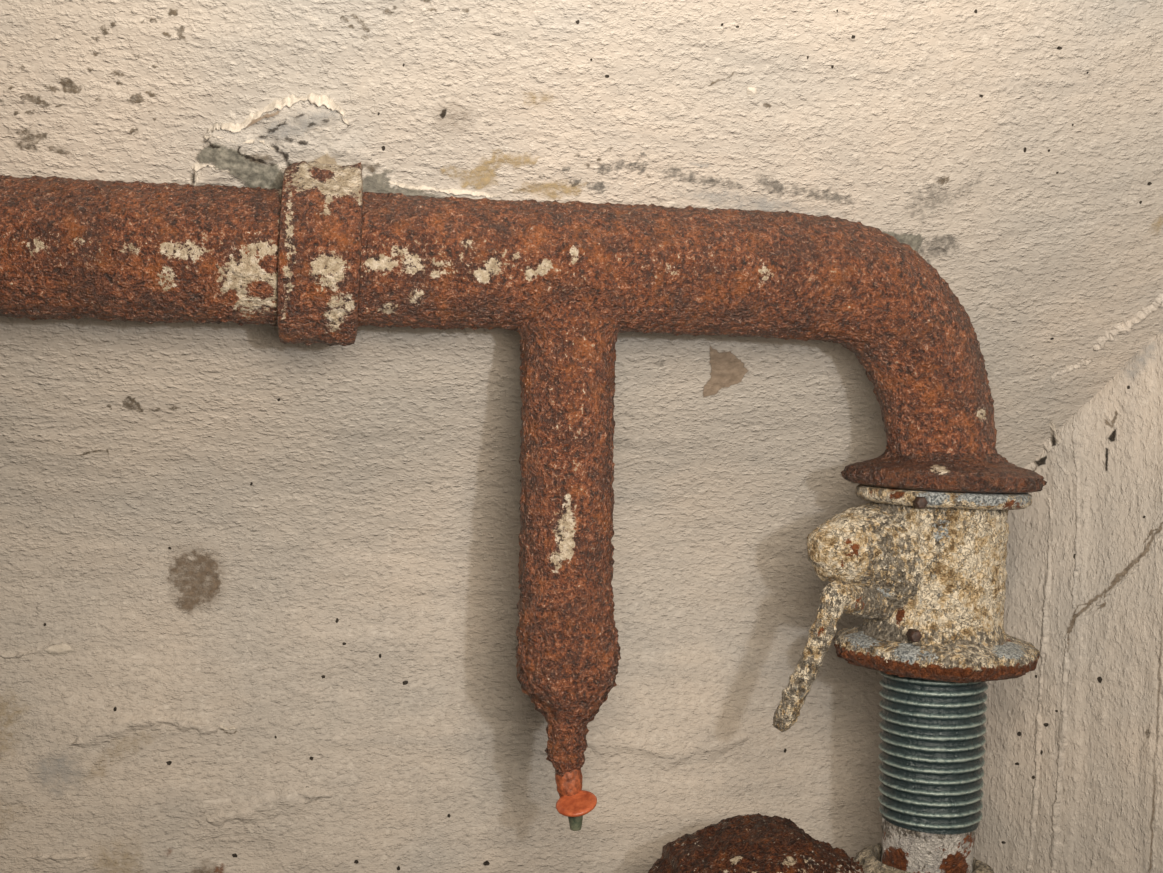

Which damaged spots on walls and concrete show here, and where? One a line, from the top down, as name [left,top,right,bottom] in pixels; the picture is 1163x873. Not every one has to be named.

flaking render [192,114,329,190]
water stain [170,551,220,611]
crack [1065,522,1163,648]
crack [1149,635,1163,873]